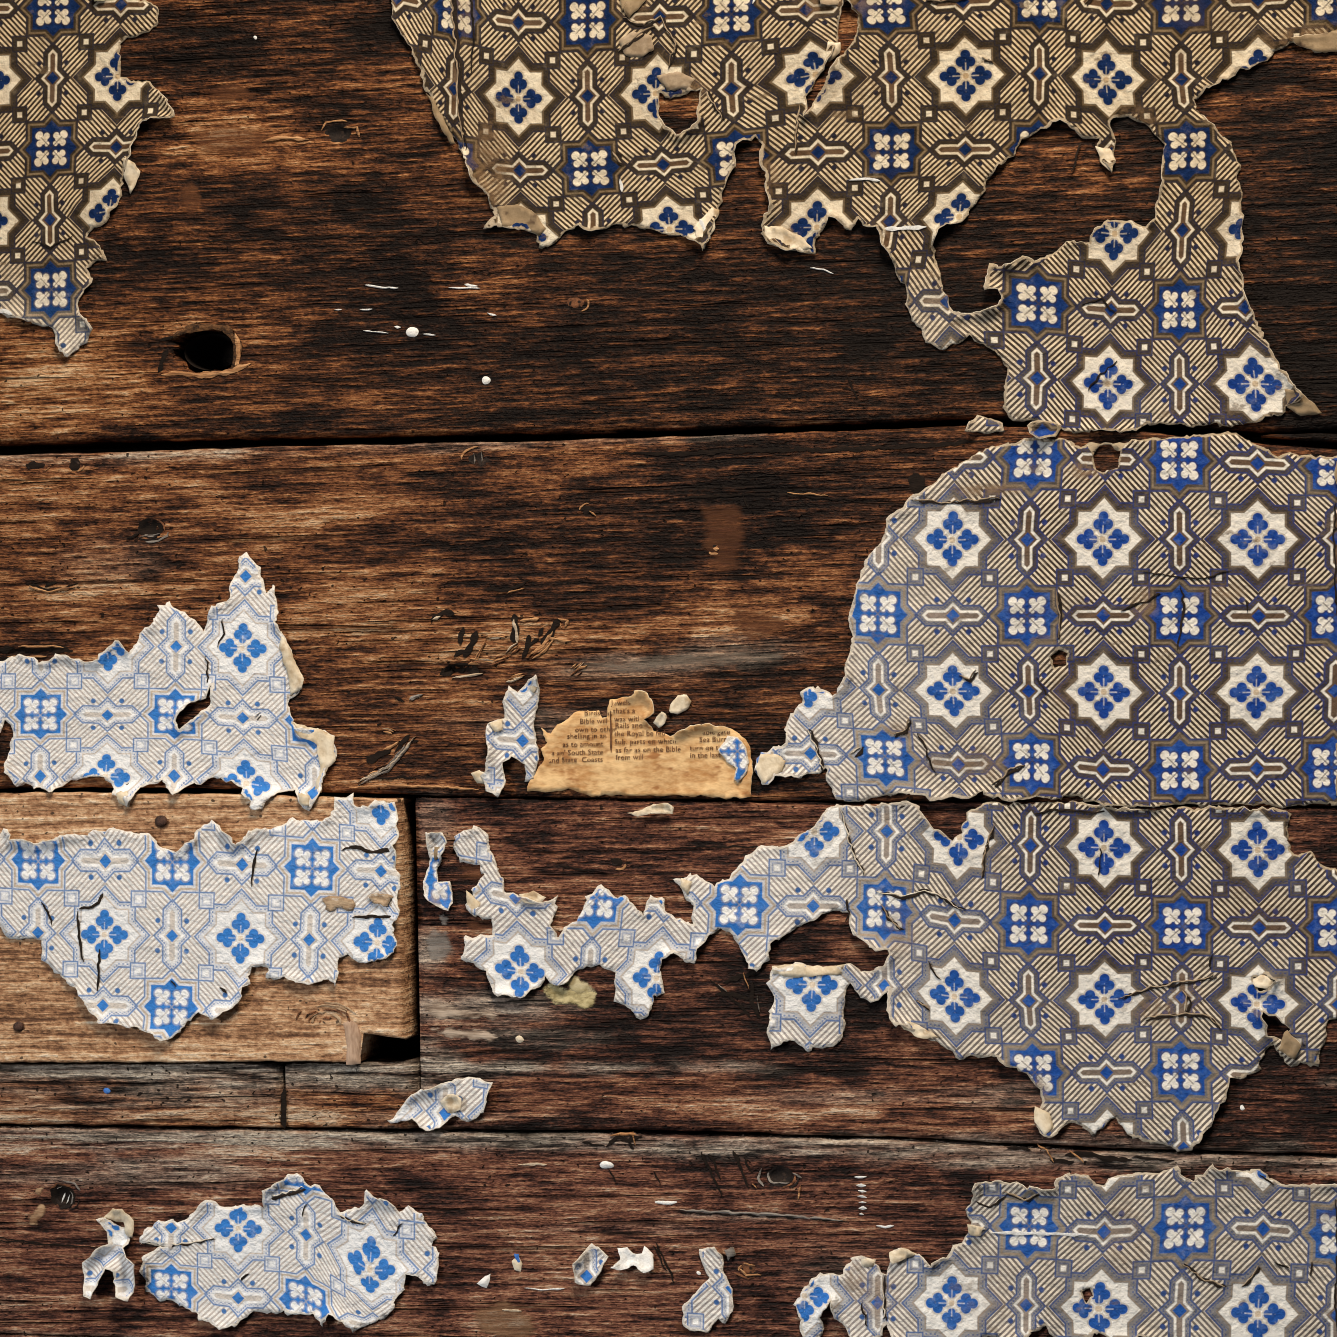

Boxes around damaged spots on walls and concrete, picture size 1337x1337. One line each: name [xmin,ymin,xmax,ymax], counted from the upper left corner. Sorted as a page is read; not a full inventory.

spalling [26,582,77,593]
spalling [431,609,571,682]
peeling [653,694,691,728]
peeling [425,1002,498,1041]